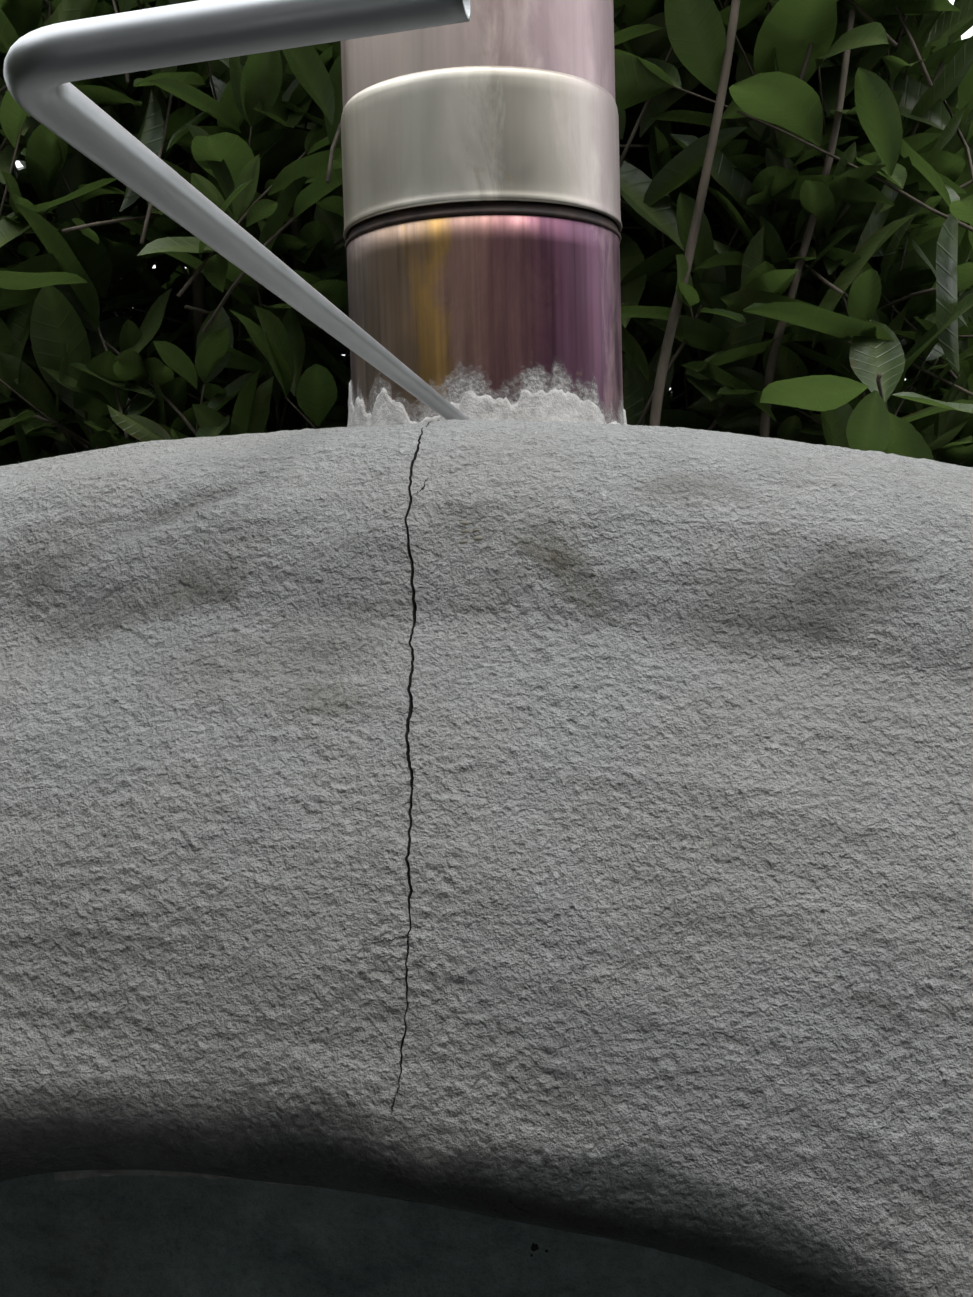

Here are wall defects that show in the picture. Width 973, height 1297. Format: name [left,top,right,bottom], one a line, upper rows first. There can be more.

crack [363,420,442,1111]